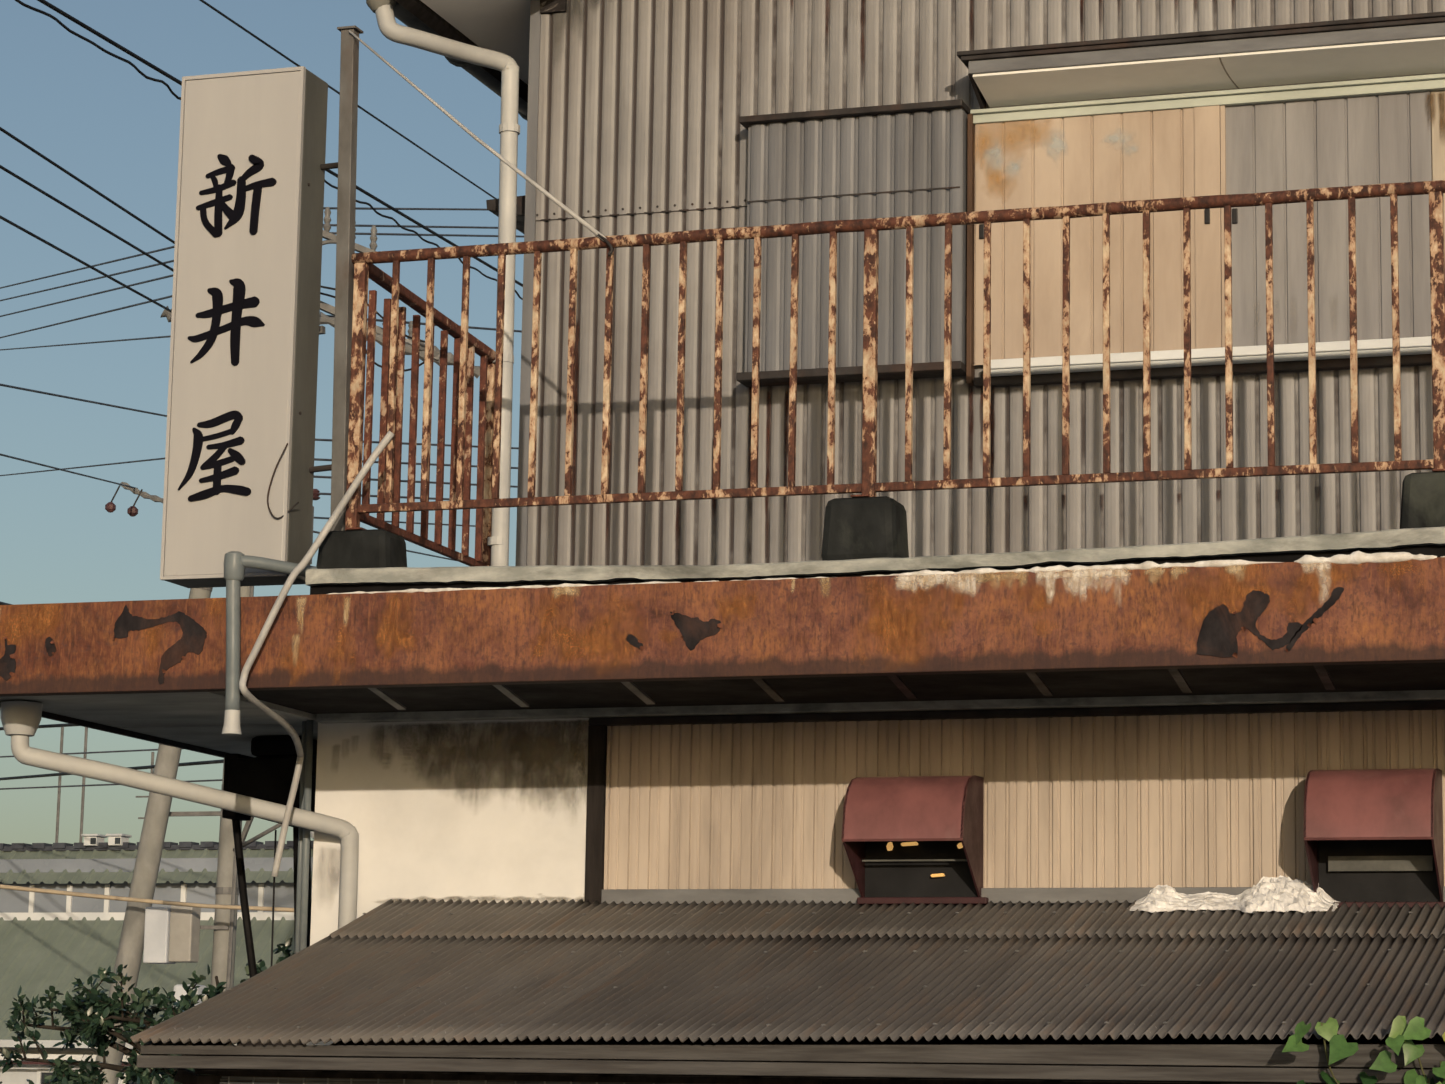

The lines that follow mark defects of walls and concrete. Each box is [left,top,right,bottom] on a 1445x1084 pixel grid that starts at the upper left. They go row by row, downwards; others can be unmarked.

rust [748,387,789,515]
rust [969,373,995,478]
peeling [0,637,16,681]
peeling [113,605,207,684]
peeling [626,634,645,651]
peeling [670,610,722,651]
peeling [1196,587,1344,658]